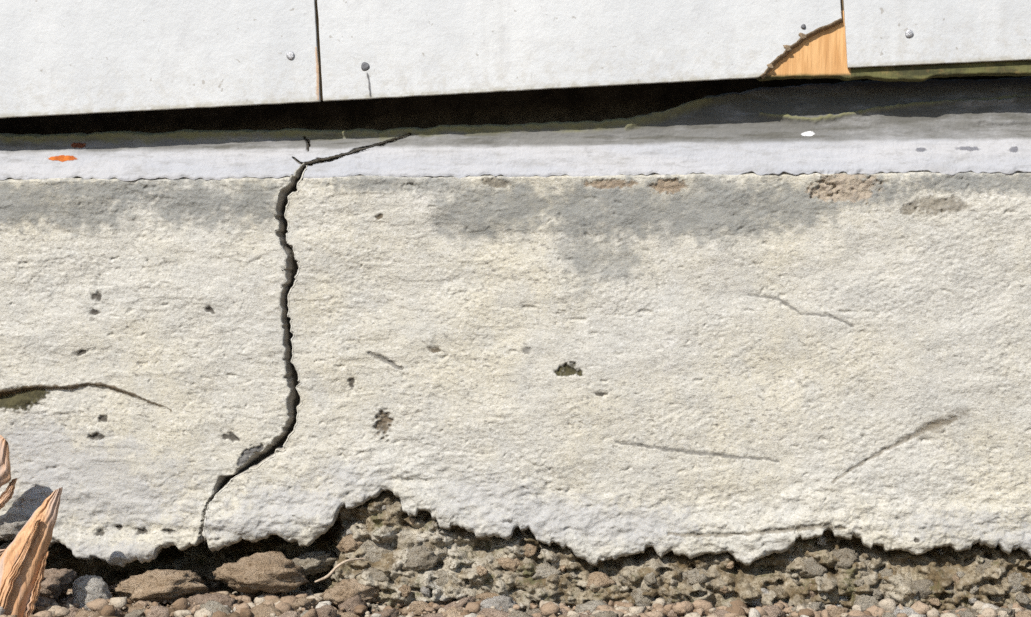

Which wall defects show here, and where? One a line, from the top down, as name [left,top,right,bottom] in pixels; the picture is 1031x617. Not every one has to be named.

spalling [760,18,843,79]
rust [48,143,86,162]
water stain [449,181,836,237]
crack [199,134,410,544]
crack [0,382,172,411]
spalling [45,490,1031,617]